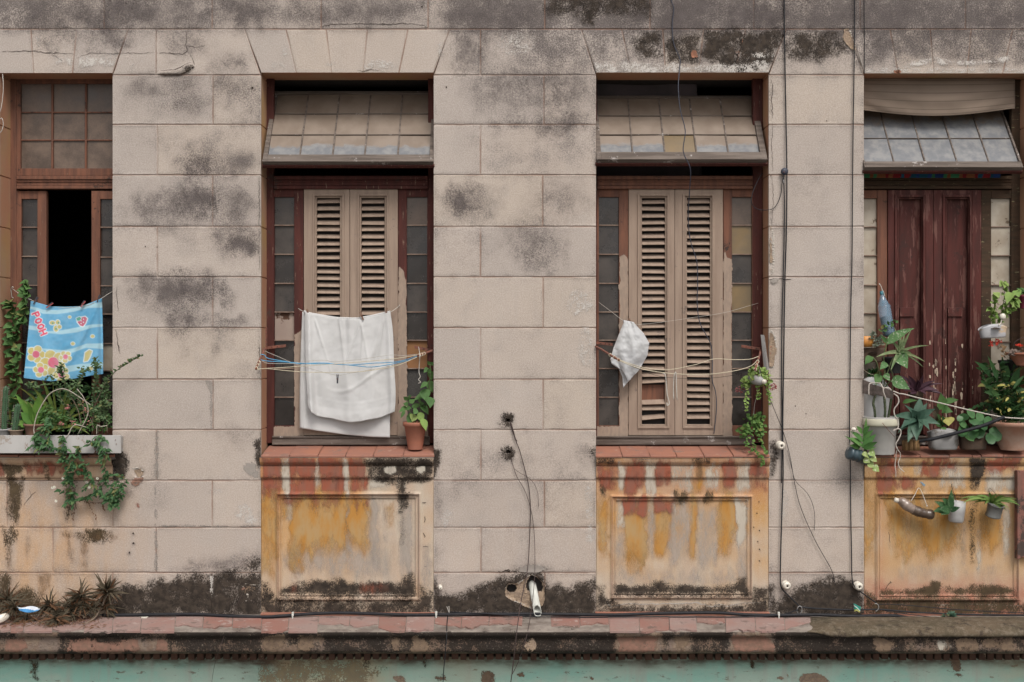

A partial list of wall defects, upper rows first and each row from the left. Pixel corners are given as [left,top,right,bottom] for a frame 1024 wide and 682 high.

leakage [444,0,849,73]
leakage [138,187,213,216]
leakage [215,233,256,254]
leakage [139,274,210,306]
peeling [929,358,973,417]
leakage [95,452,130,487]
leakage [0,464,25,559]
leakage [77,529,111,543]
leakage [110,449,1024,614]
flaking render [505,565,548,609]